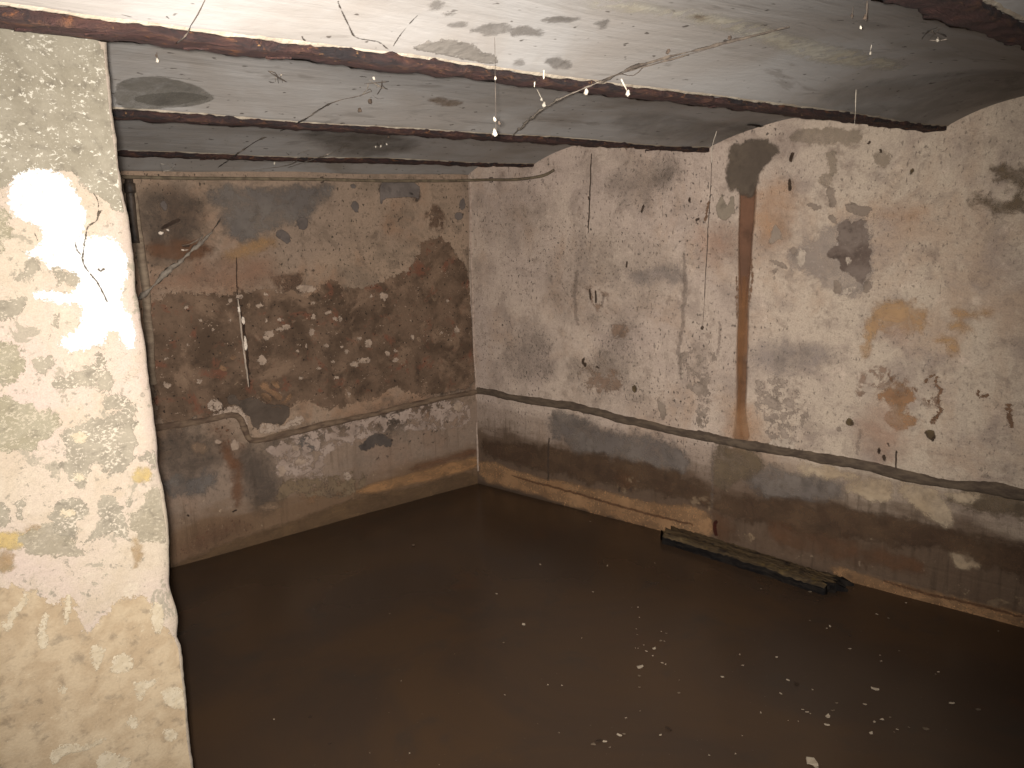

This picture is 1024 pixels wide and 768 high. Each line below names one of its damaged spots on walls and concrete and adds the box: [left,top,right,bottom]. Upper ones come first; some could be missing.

crack [338,1,416,48]
water stain [435,2,540,36]
water stain [115,76,212,110]
peeling [0,296,28,322]
peeling [15,257,81,288]
crack [75,193,108,302]
corrosion [726,139,779,440]
flaking render [769,151,874,298]
corrosion [857,366,944,447]
peeling [0,340,166,559]
water stain [162,432,217,497]
water stain [179,411,1024,628]